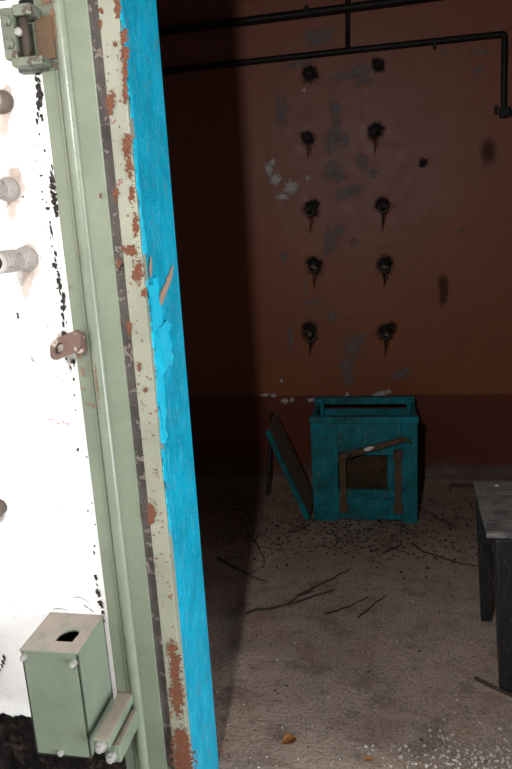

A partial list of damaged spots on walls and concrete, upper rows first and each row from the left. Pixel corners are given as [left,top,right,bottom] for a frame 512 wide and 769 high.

corrosion [104,0,130,116]
corrosion [112,126,147,298]
corrosion [147,490,164,536]
corrosion [165,626,201,769]